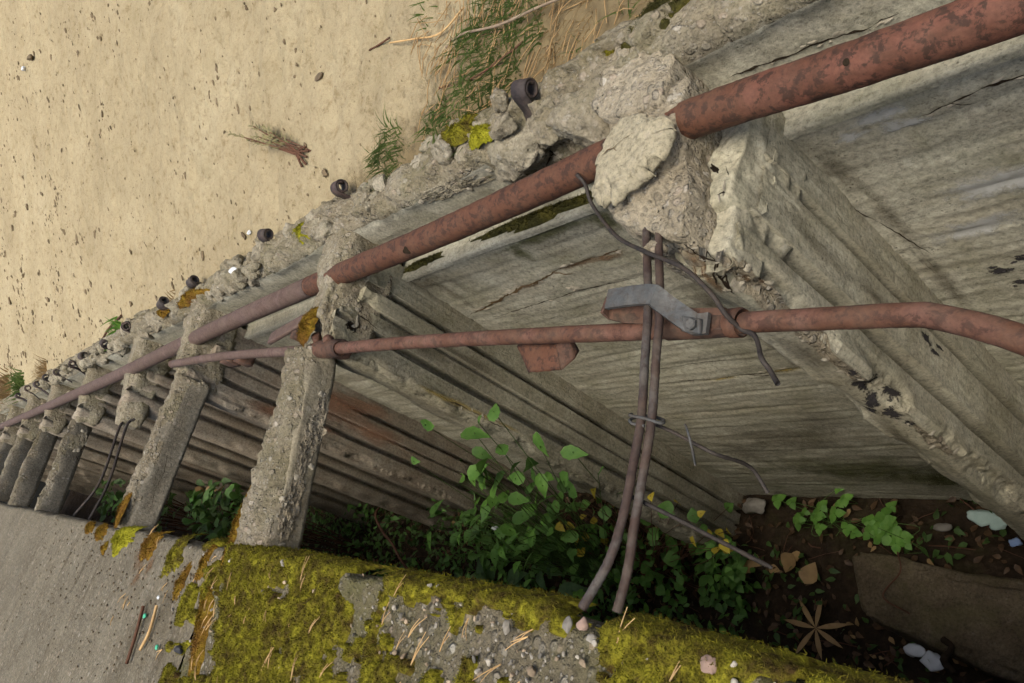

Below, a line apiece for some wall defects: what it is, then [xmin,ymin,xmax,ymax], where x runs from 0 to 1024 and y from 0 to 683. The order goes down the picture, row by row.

crack [922,75,1024,117]
spalling [415,169,496,204]
crack [470,249,638,317]
leakage [846,369,915,426]